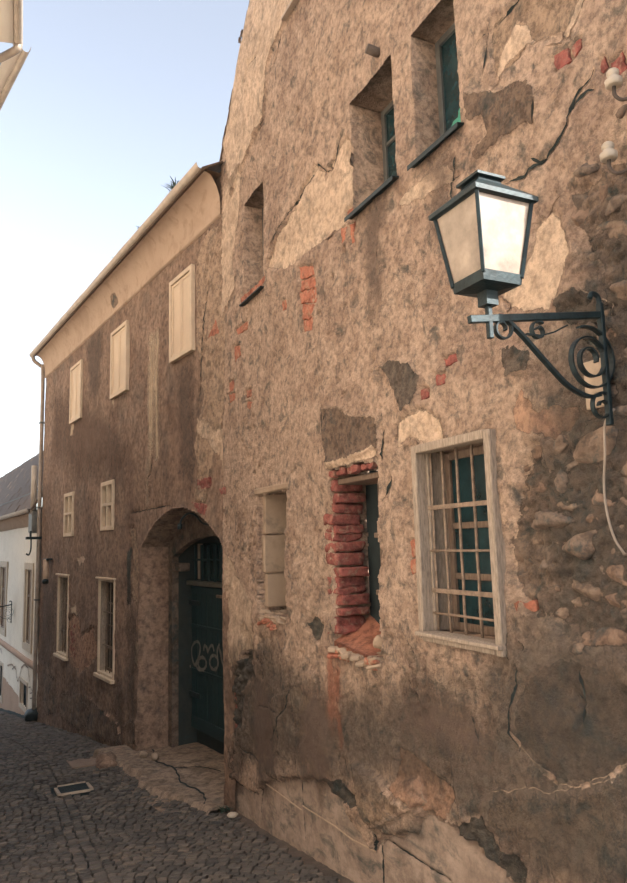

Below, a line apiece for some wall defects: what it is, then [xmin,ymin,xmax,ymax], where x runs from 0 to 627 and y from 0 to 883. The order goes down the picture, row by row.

crack [476,0,519,74]
peeling [487,0,585,92]
peeling [208,0,296,338]
peeling [262,138,356,332]
crack [268,137,351,255]
crack [506,70,594,184]
peeling [393,353,458,450]
crack [507,670,520,750]
spalling [324,779,357,808]
crack [373,832,451,883]
peeling [382,748,527,883]
peeling [509,731,627,789]